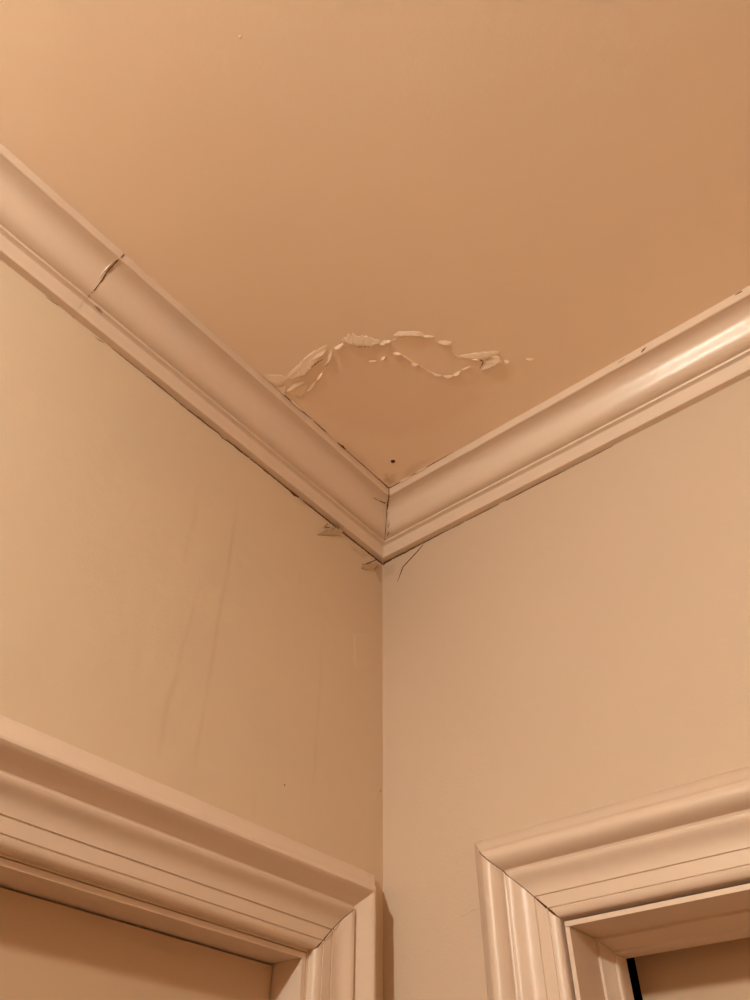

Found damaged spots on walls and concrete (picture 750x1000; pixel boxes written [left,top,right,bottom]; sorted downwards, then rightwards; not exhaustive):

crack [88,254,125,297]
crack [95,337,612,582]